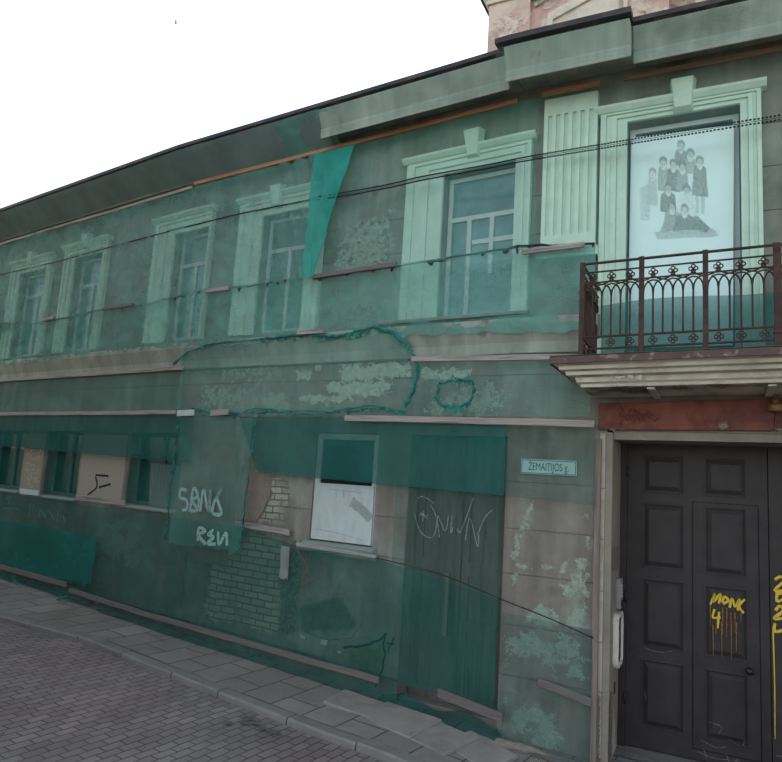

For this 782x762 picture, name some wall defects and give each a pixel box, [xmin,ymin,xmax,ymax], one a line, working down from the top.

peeling [198,361,514,418]
flaking render [258,476,290,526]
peeling [510,500,591,599]